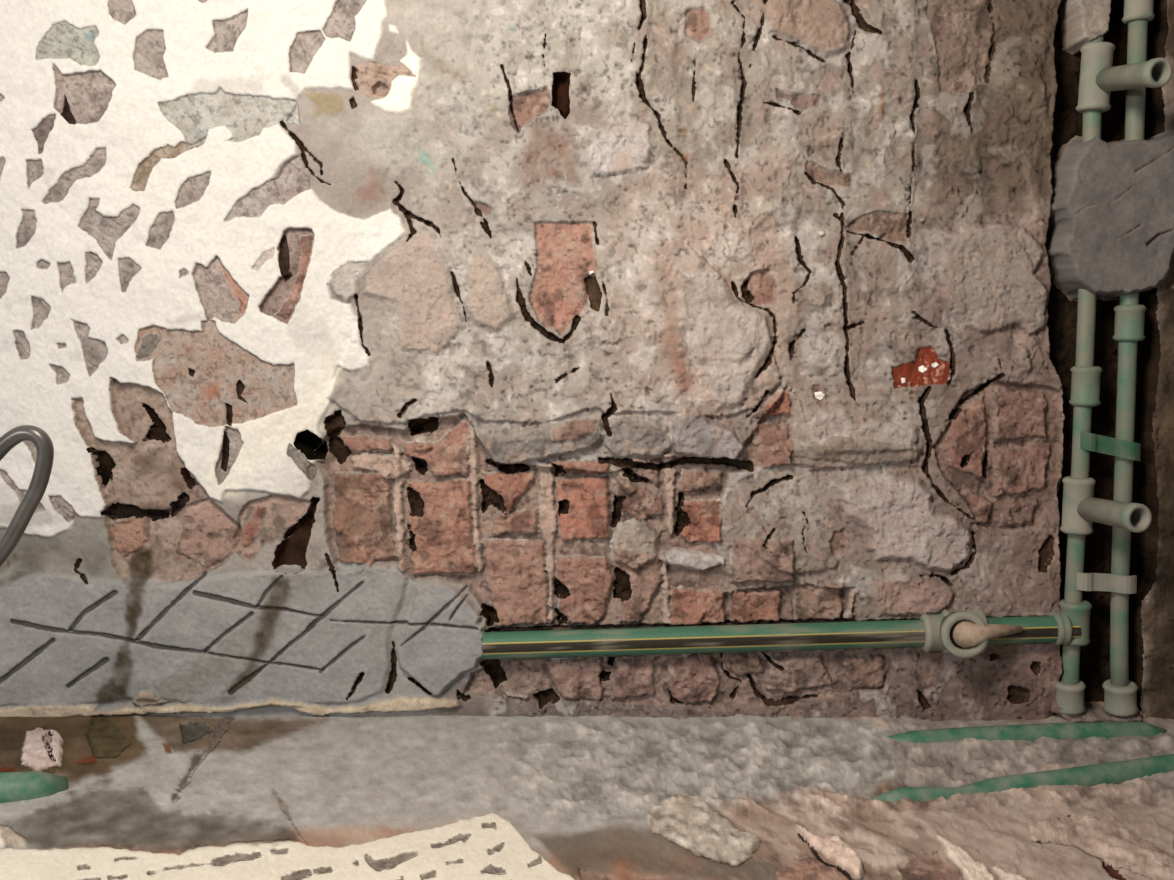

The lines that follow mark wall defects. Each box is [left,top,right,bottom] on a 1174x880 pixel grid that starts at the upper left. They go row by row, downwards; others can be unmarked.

peeling [25,20,116,190]
peeling [36,87,311,293]
peeling [288,0,366,74]
crack [516,261,609,383]
crack [631,0,688,189]
crack [724,0,882,218]
crack [731,80,920,418]
spalling [55,221,859,631]
crack [598,393,793,507]
crack [912,311,1005,589]
spalling [932,381,1063,573]
spalling [457,648,898,710]